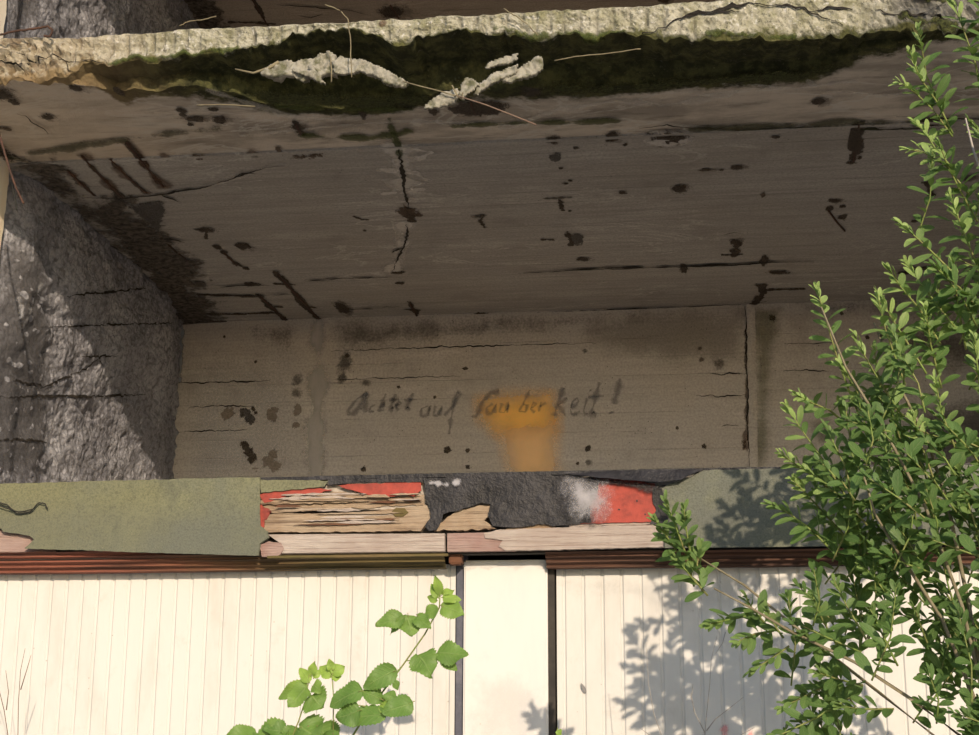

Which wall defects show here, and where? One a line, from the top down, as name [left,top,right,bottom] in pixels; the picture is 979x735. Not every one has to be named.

crack [636,2,852,43]
crack [875,3,946,20]
spalling [0,89,54,133]
spalling [175,107,226,126]
spalling [428,100,510,117]
crack [88,166,278,202]
crack [312,149,409,285]
leakage [912,330,979,356]
crack [557,304,750,466]
leakage [922,412,979,460]
peeling [260,482,422,528]
peeling [581,479,656,524]